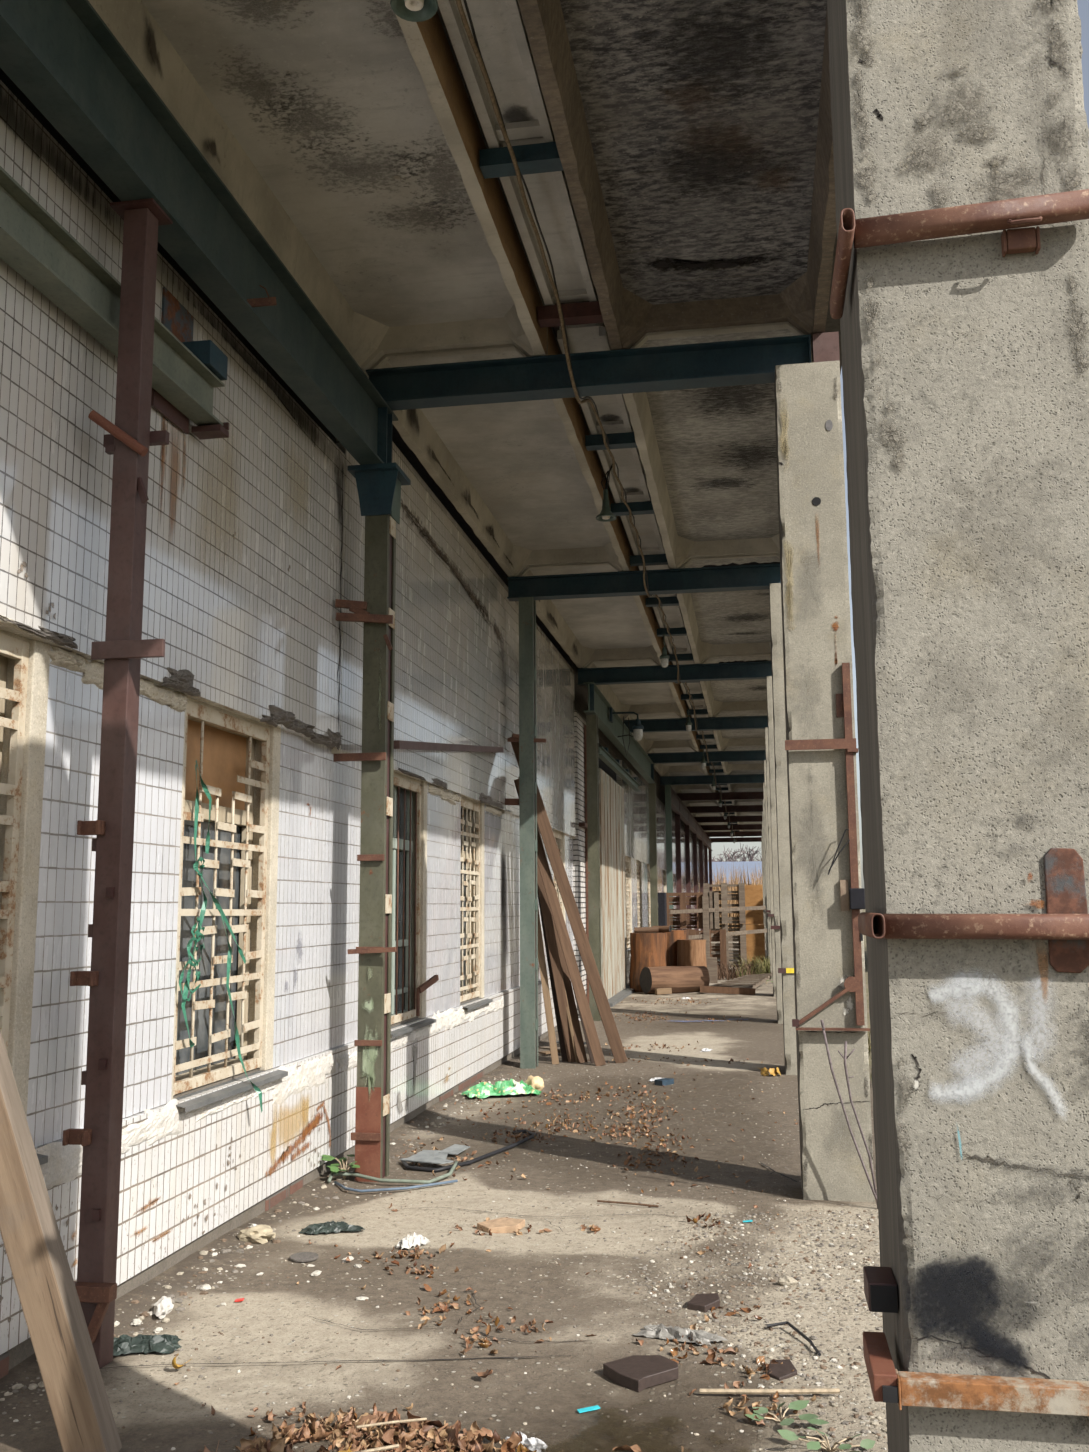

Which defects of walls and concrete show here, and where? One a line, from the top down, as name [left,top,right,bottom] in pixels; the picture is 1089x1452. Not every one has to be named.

damp [148,25,162,74]
flaking render [139,667,201,712]
spalling [259,705,343,750]
rust [266,1102,331,1176]
crack [941,1137,1089,1200]